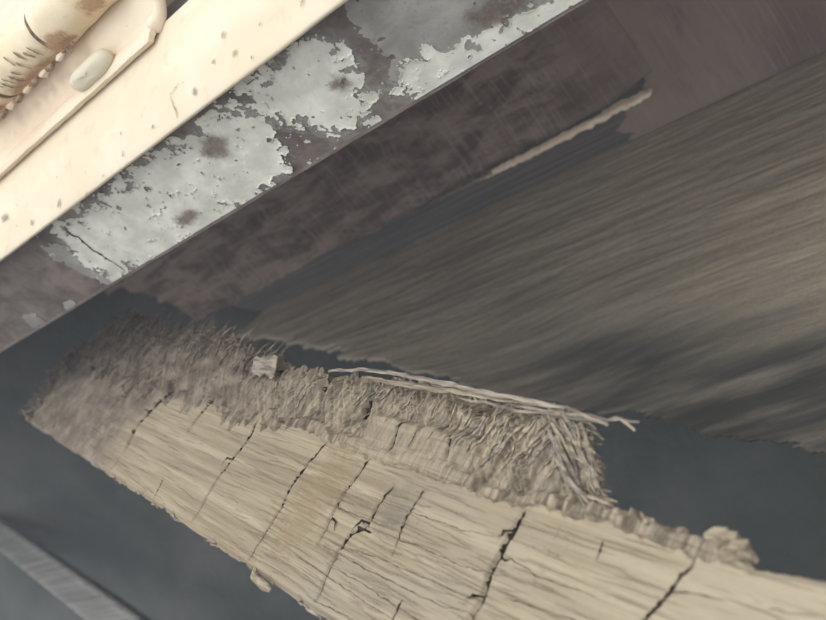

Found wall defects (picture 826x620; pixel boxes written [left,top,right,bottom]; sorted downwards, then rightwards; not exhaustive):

peeling [37,0,582,285]
crack [64,228,123,270]
peeling [22,313,46,328]
peeling [252,355,279,379]
crack [114,392,174,466]
crack [362,400,373,421]
crack [195,422,257,517]
crack [250,442,327,558]
crack [296,461,592,620]
crack [644,555,727,620]